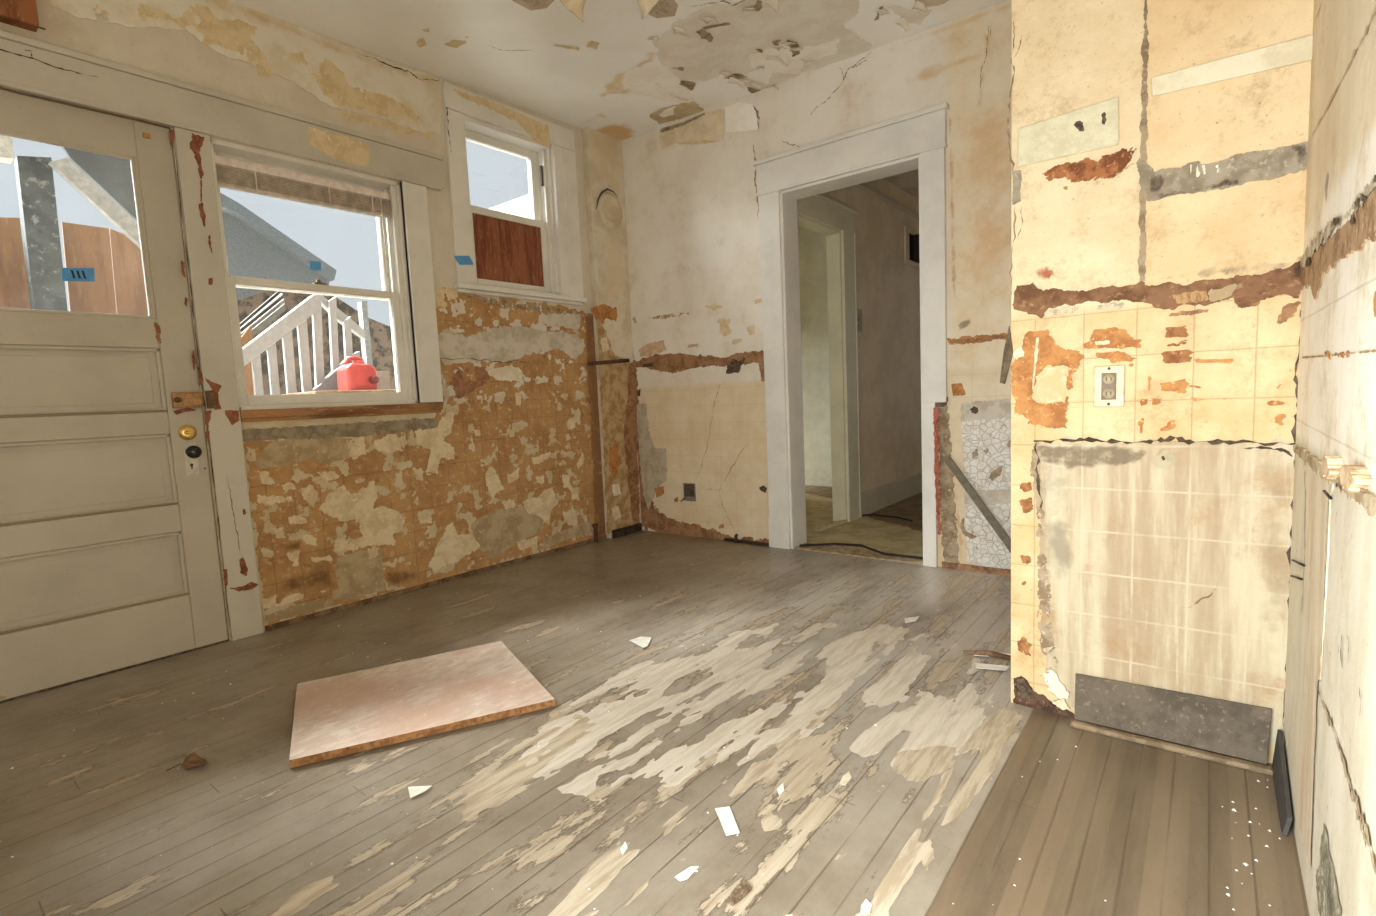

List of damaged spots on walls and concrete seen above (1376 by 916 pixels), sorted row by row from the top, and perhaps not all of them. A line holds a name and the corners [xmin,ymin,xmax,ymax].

flaking render [173,287,585,474]
flaking render [243,470,480,571]
flaking render [223,558,304,608]